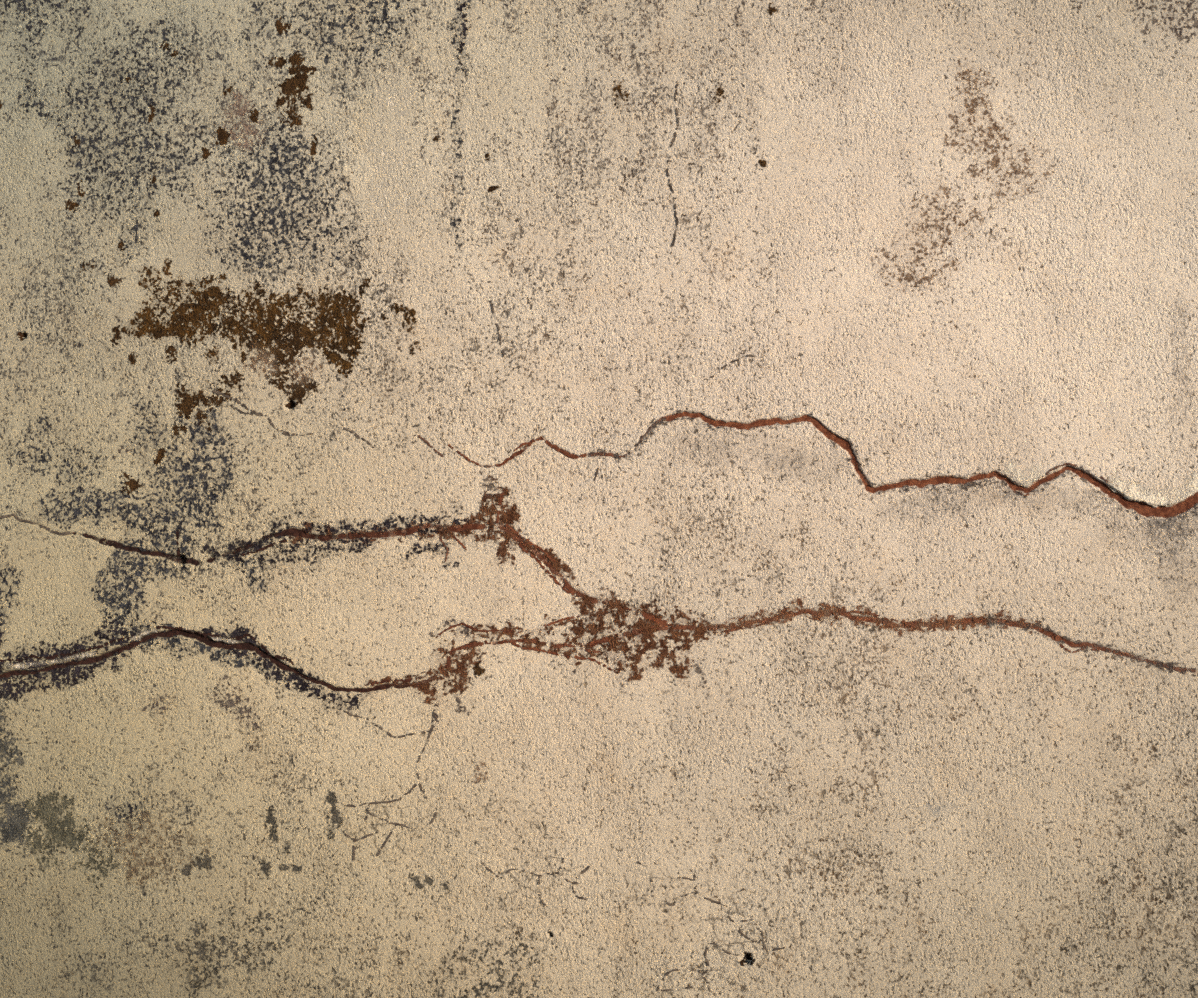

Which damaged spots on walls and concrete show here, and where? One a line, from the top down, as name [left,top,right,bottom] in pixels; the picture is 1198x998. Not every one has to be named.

rust [249,51,317,129]
rust [276,18,291,34]
water stain [241,0,419,89]
water stain [450,0,471,161]
water stain [0,0,362,276]
rust [202,126,230,161]
rust [80,260,122,287]
rust [110,258,421,466]
crack [704,354,763,380]
crack [212,390,313,436]
rust [122,472,143,496]
crack [0,410,1198,868]